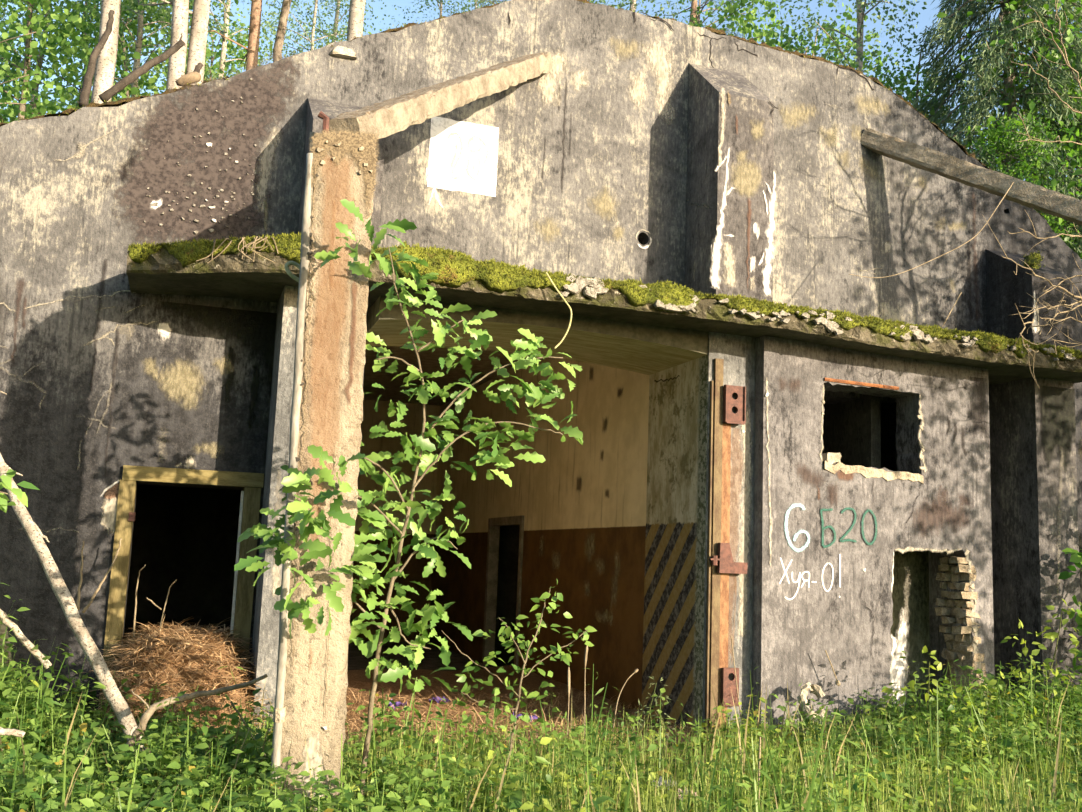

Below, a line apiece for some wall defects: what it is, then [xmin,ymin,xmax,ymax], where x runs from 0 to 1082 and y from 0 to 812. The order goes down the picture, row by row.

water stain [712,150,735,287]
water stain [750,172,776,295]
rust [345,283,357,402]
spalling [917,396,927,472]
spalling [891,547,986,685]